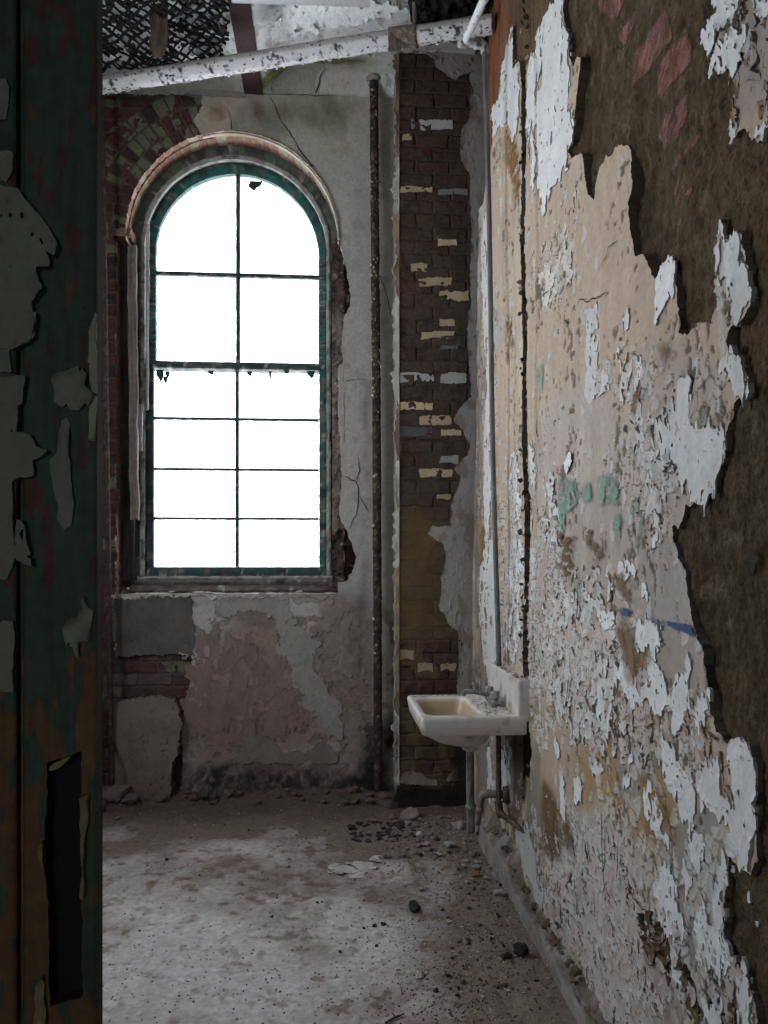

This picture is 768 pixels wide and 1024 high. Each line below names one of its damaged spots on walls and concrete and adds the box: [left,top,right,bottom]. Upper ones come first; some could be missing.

peeling [0,78,11,122]
crack [263,68,327,167]
peeling [0,150,75,580]
spalling [49,0,408,790]
crack [344,459,370,527]
spalling [345,0,768,1024]
peeling [0,620,19,692]
peeling [79,792,90,900]
peeling [33,974,48,1024]